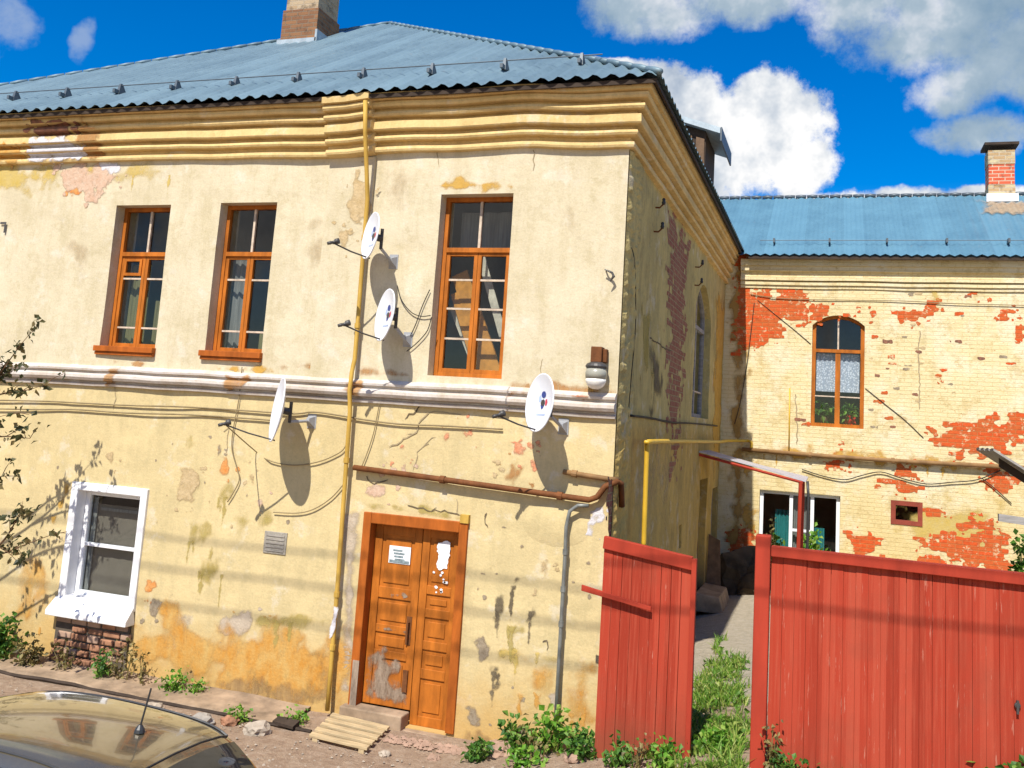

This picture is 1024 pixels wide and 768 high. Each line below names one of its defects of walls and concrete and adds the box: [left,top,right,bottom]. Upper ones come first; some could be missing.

flaking render [0,118,127,208]
flaking render [332,161,380,257]
flaking render [665,210,691,482]
flaking render [730,253,964,377]
crack [389,406,465,469]
spalling [492,439,541,487]
flaking render [924,411,1024,497]
flaking render [843,527,885,557]
flaking render [874,459,1013,571]
leakage [135,513,359,705]
leakage [495,586,518,673]
leakage [490,671,500,697]